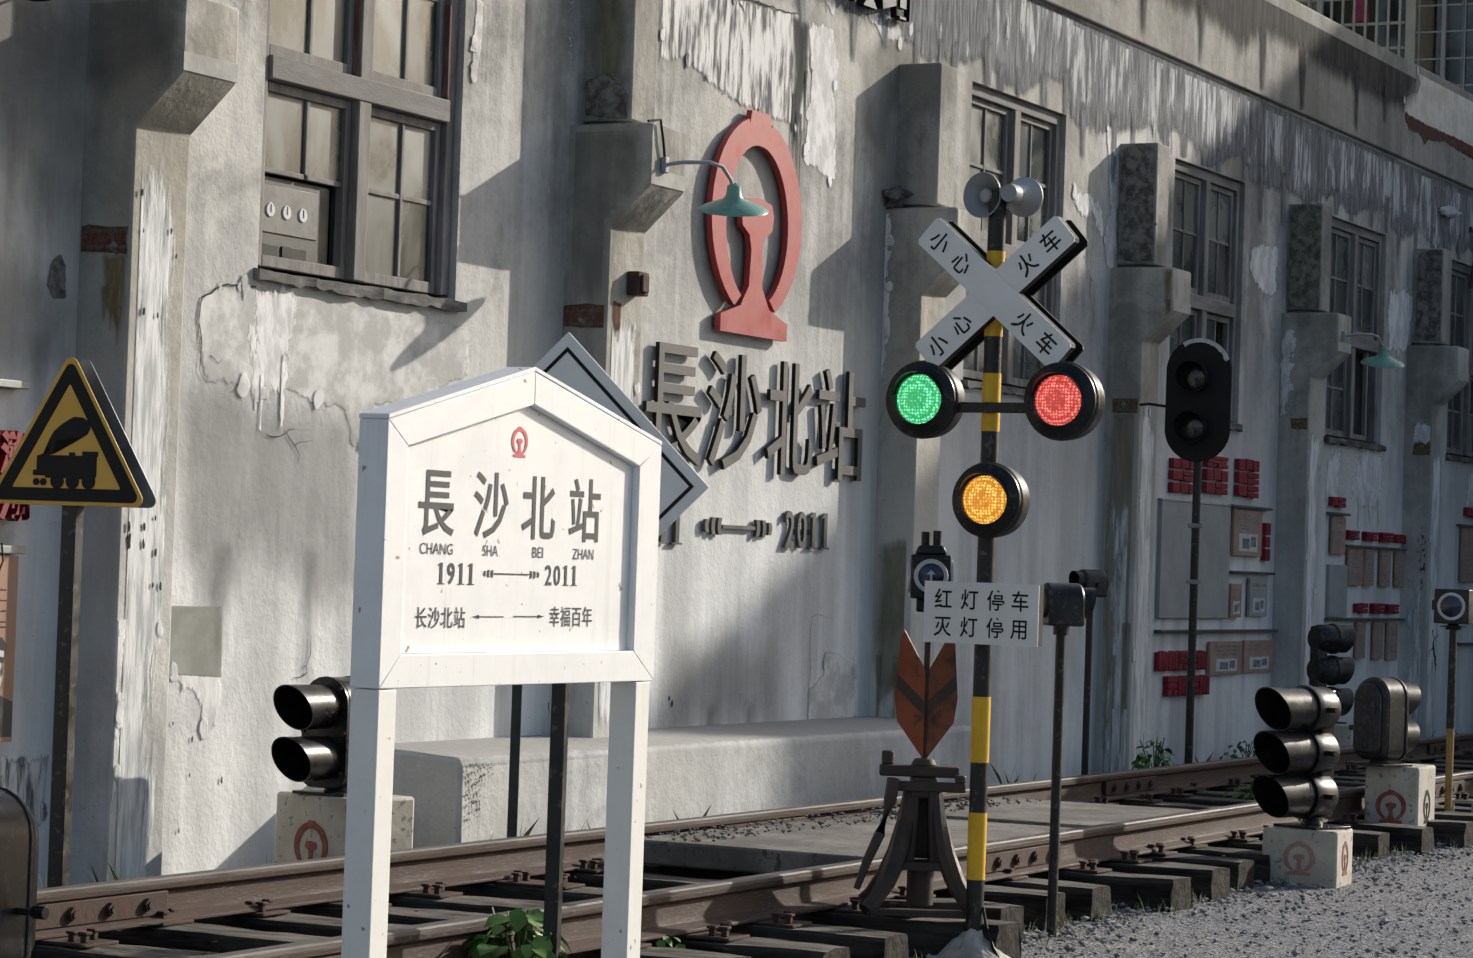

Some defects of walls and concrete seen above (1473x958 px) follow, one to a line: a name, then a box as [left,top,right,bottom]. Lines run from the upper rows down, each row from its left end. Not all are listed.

peeling [660,0,838,187]
water stain [791,0,809,179]
peeling [869,12,913,50]
water stain [825,0,1473,270]
spalling [992,0,1473,356]
spalling [48,255,66,299]
corrosion [102,256,124,334]
flaking render [197,273,469,447]
peeling [81,172,222,880]